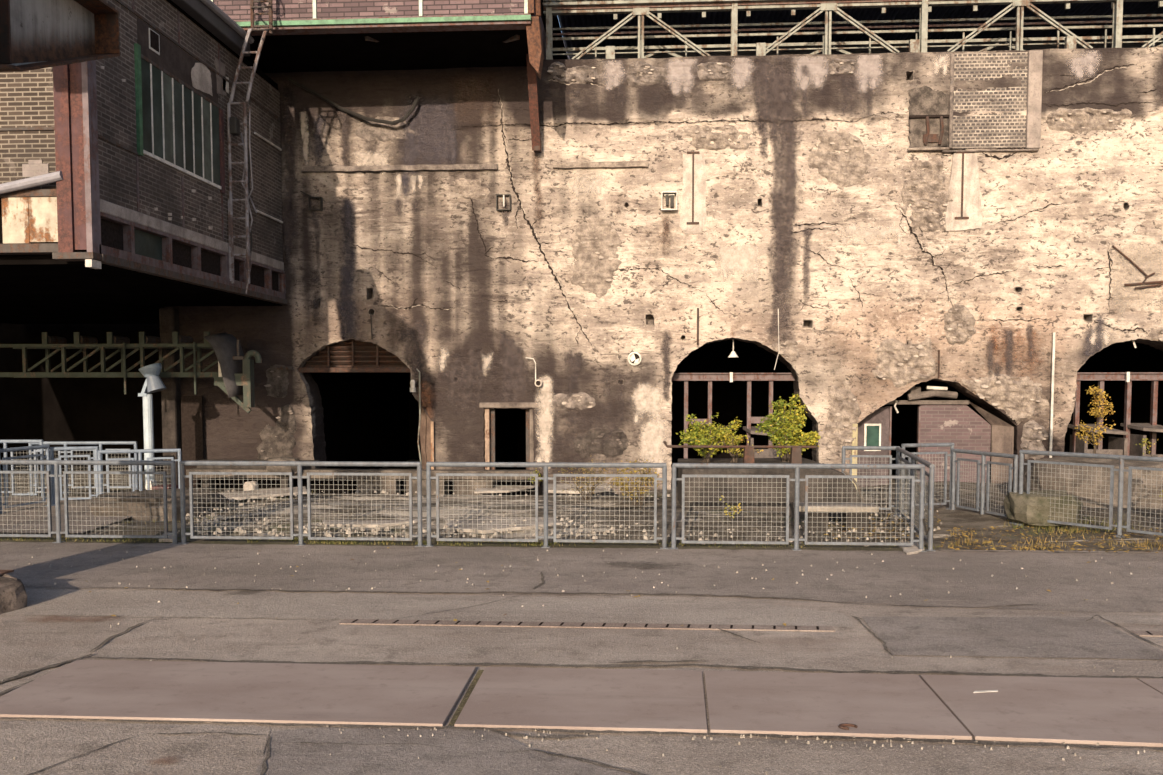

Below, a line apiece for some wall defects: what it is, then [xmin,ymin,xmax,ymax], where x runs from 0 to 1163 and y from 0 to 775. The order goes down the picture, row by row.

damp [282,86,325,320]
damp [339,200,357,339]
damp [396,93,456,214]
crack [454,88,763,352]
damp [752,57,811,345]
crack [769,222,878,315]
crack [794,112,898,122]
crack [895,203,1150,333]
damp [401,317,426,384]